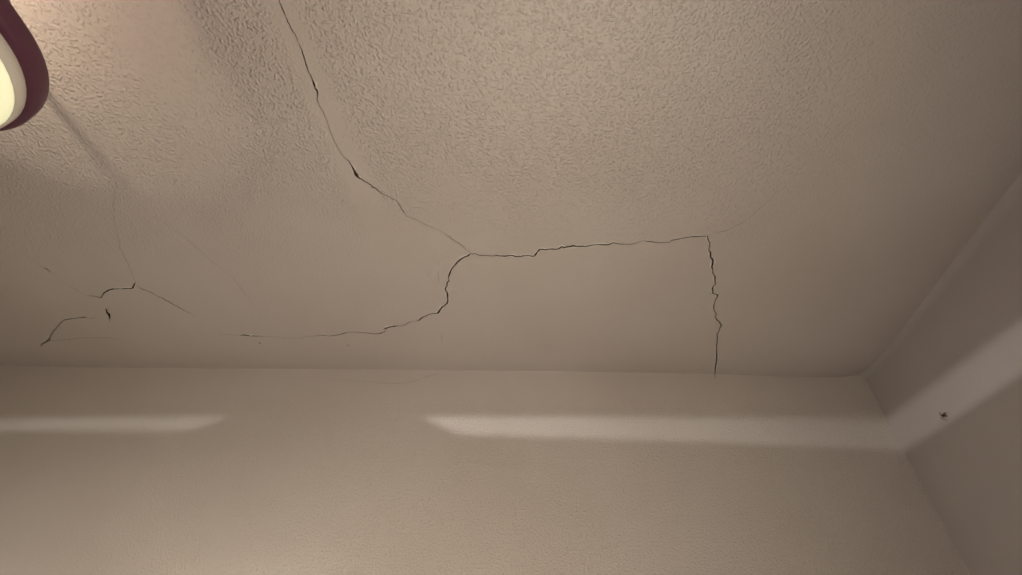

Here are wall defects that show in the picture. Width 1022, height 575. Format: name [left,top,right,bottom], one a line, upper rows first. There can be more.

crack [279,0,319,101]
crack [347,160,404,212]
crack [65,283,181,320]
crack [369,241,622,334]
crack [646,235,723,375]